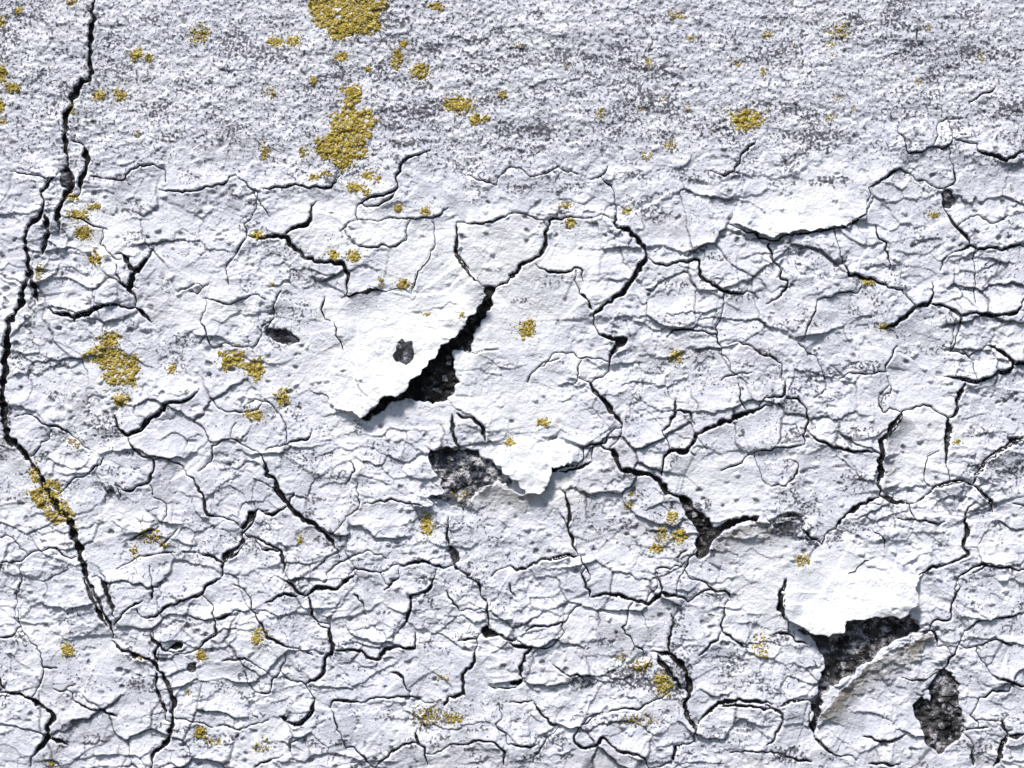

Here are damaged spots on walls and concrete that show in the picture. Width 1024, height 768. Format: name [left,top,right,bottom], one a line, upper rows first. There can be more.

crack [0,0,582,768]
peeling [265,249,495,421]
spalling [399,436,584,546]
crack [454,118,1024,768]
spalling [679,495,965,754]